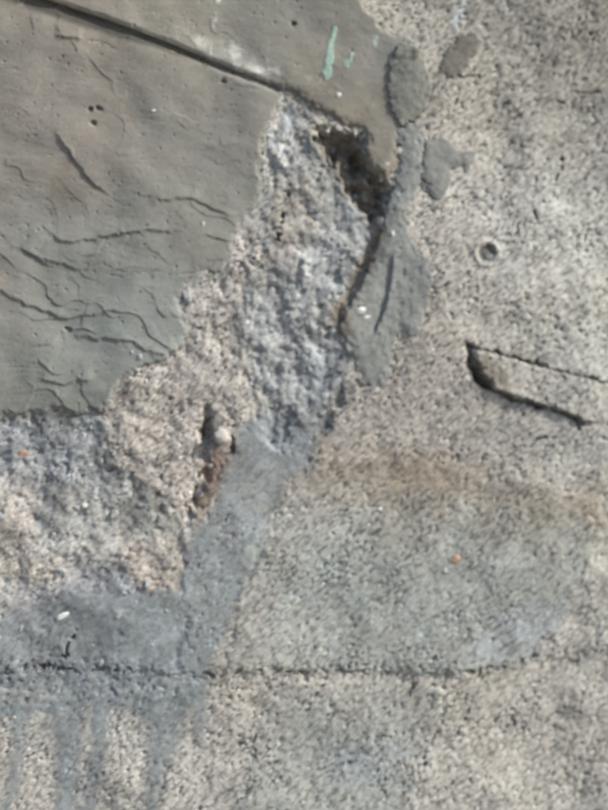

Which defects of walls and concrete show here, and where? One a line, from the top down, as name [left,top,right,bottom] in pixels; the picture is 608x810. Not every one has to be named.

spalling [0,105,386,697]
crack [467,347,608,430]
leakage [0,417,312,810]